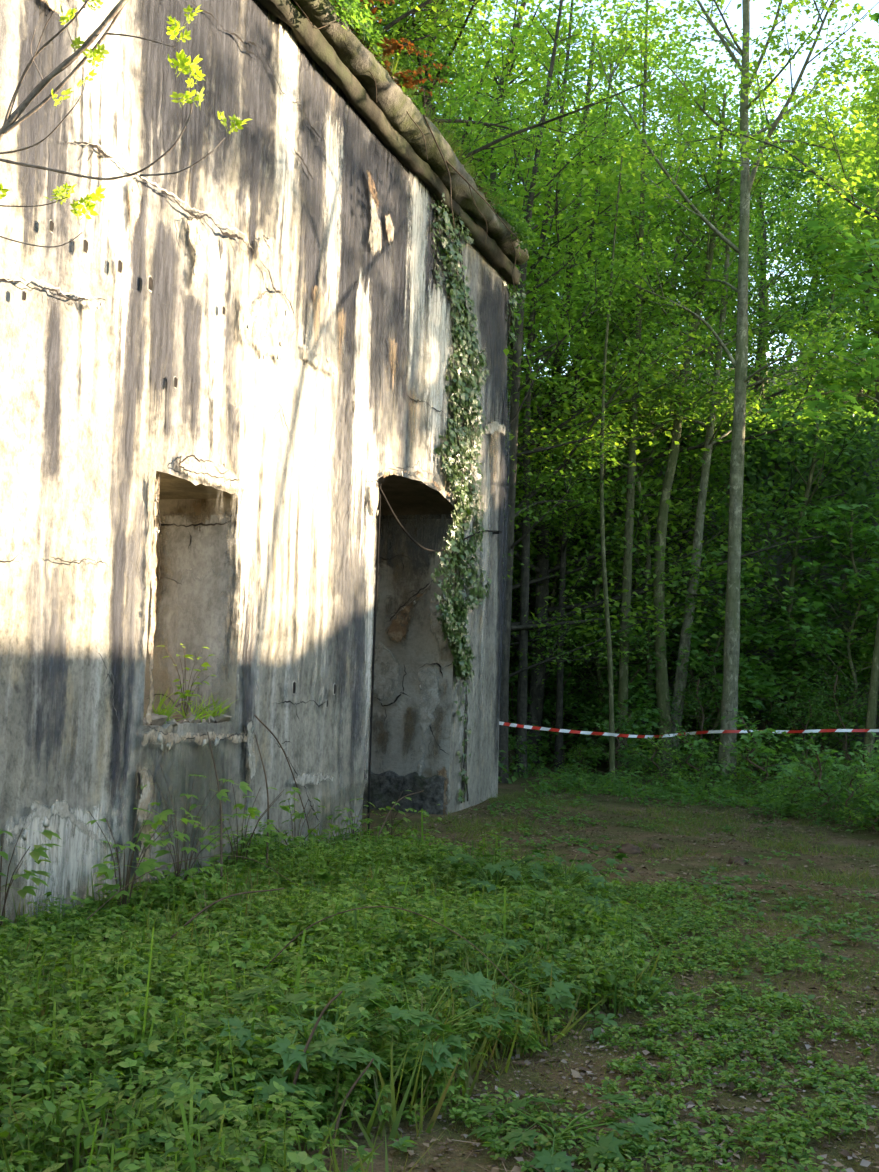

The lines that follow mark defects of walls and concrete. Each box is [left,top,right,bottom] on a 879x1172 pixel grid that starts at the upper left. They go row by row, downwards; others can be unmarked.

spalling [46,0,71,17]
crack [59,140,296,336]
spalling [366,169,395,253]
crack [0,275,102,311]
peeling [239,295,294,365]
peeling [303,345,338,377]
leakage [18,0,450,857]
spalling [485,418,507,435]
spalling [179,455,248,491]
leakage [464,271,513,754]
spalling [142,472,256,778]
crack [373,662,451,725]